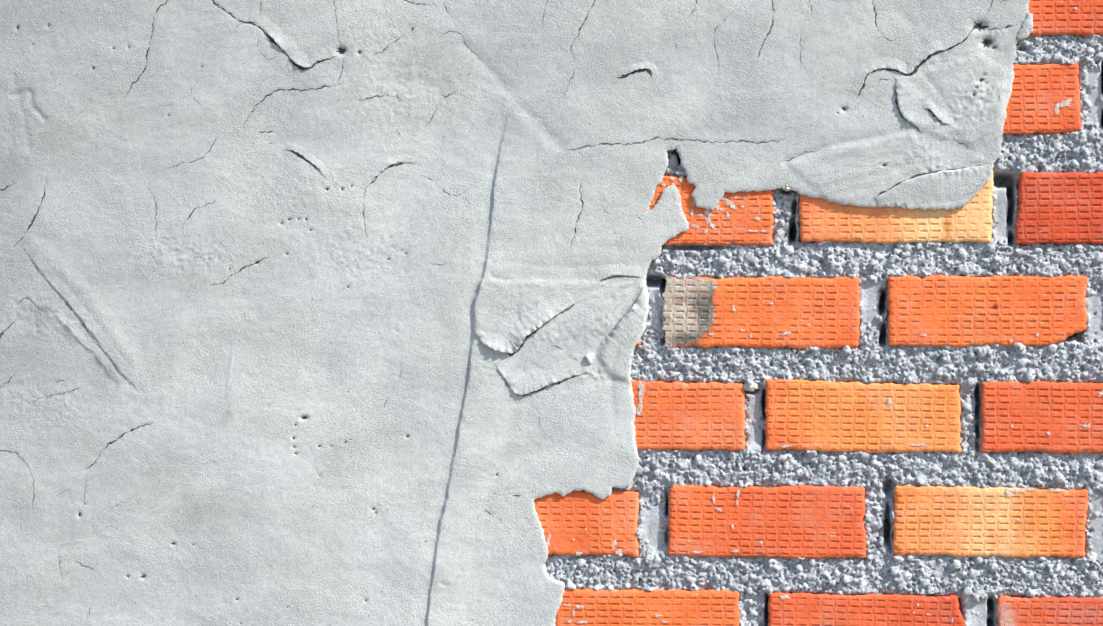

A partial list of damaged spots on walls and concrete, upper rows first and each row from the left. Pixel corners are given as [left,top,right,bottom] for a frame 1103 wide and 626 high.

crack [126,0,168,96]
crack [212,0,263,55]
crack [378,0,479,58]
flaking render [1016,13,1033,40]
crack [247,66,343,144]
crack [571,136,814,161]
spalling [662,149,683,187]
peeling [690,196,744,233]
peeling [594,264,642,282]
peeling [636,382,644,416]
crack [86,424,150,470]